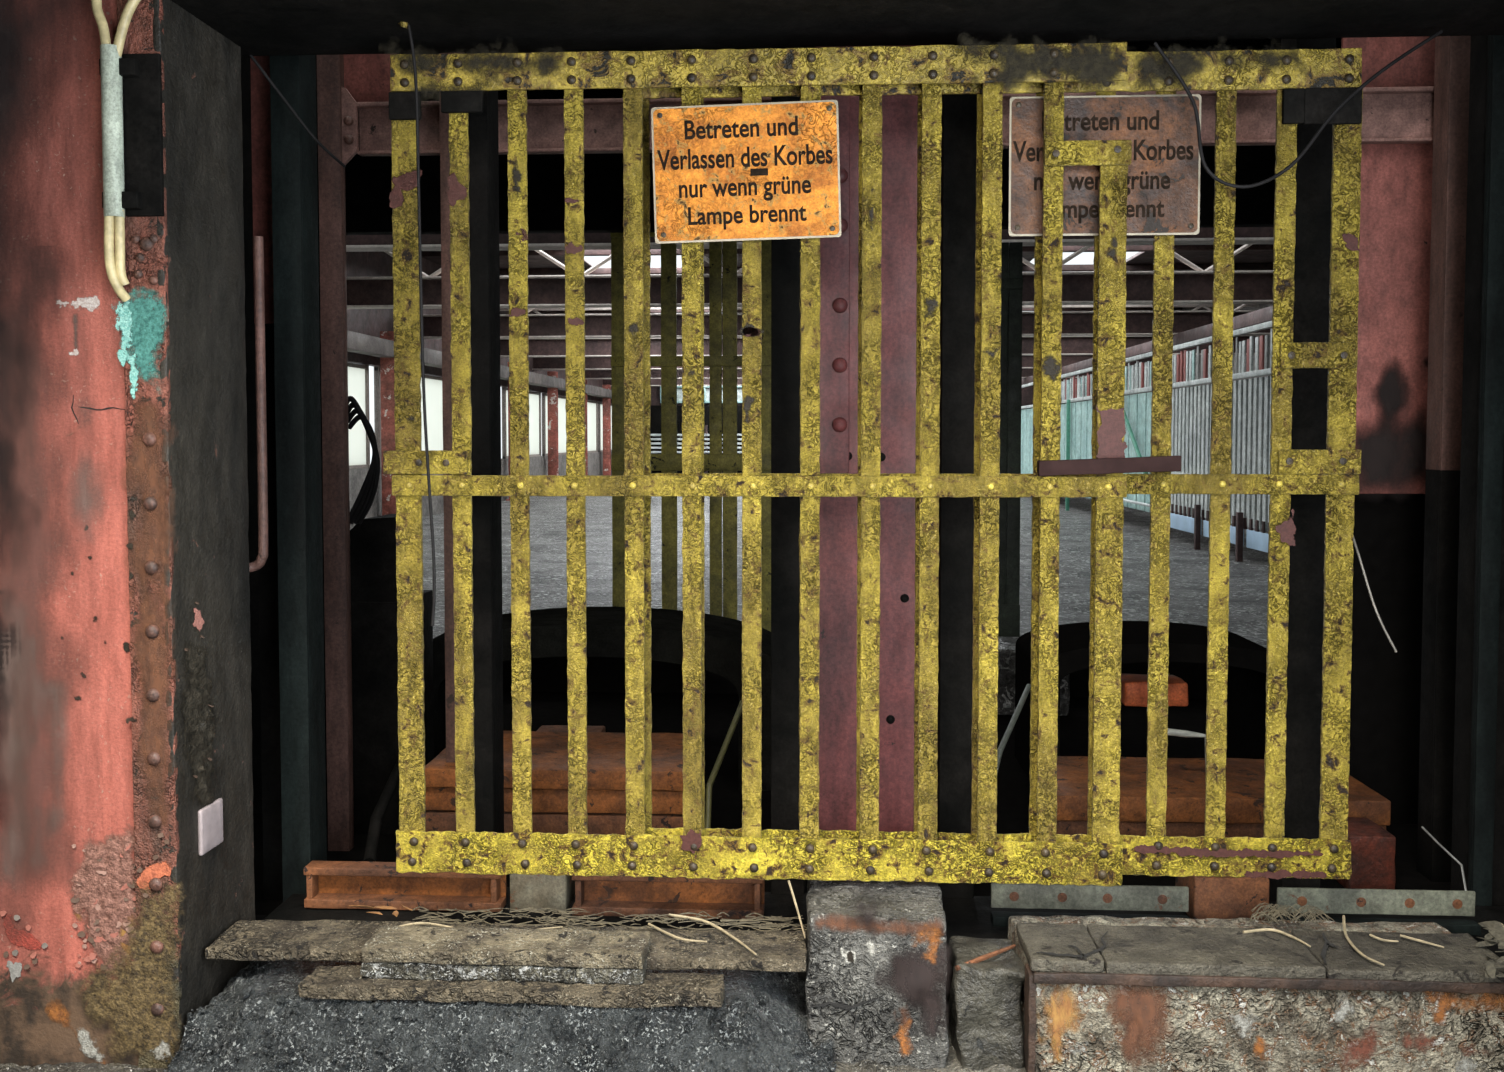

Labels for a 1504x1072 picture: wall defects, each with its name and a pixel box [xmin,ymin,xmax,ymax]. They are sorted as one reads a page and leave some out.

peeling [71,829,171,972]
corrosion [82,884,182,1064]
corrosion [920,929,940,962]
corrosion [47,1002,69,1025]
corrosion [898,1017,911,1055]
corrosion [1047,989,1076,1061]
corrosion [1110,986,1165,1061]